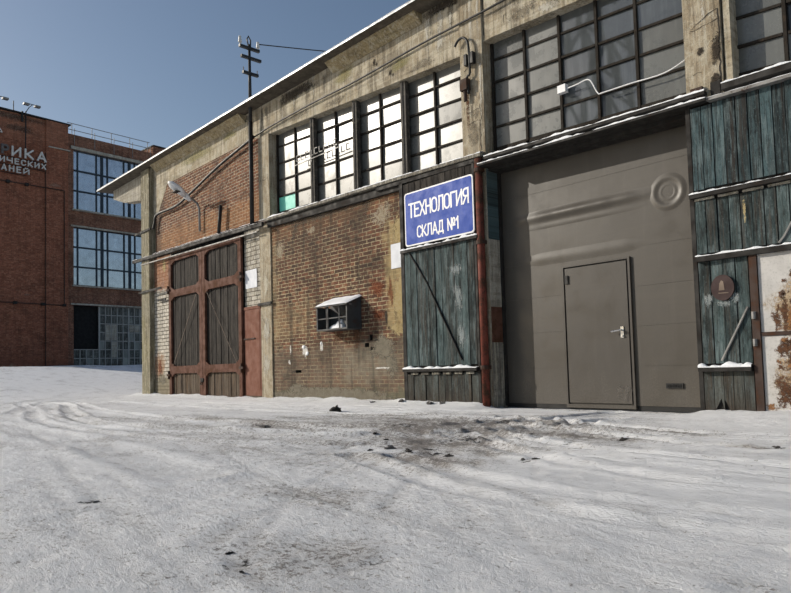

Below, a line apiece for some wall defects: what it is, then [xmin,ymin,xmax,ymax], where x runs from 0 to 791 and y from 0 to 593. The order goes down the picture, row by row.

rust [764,269,791,411]